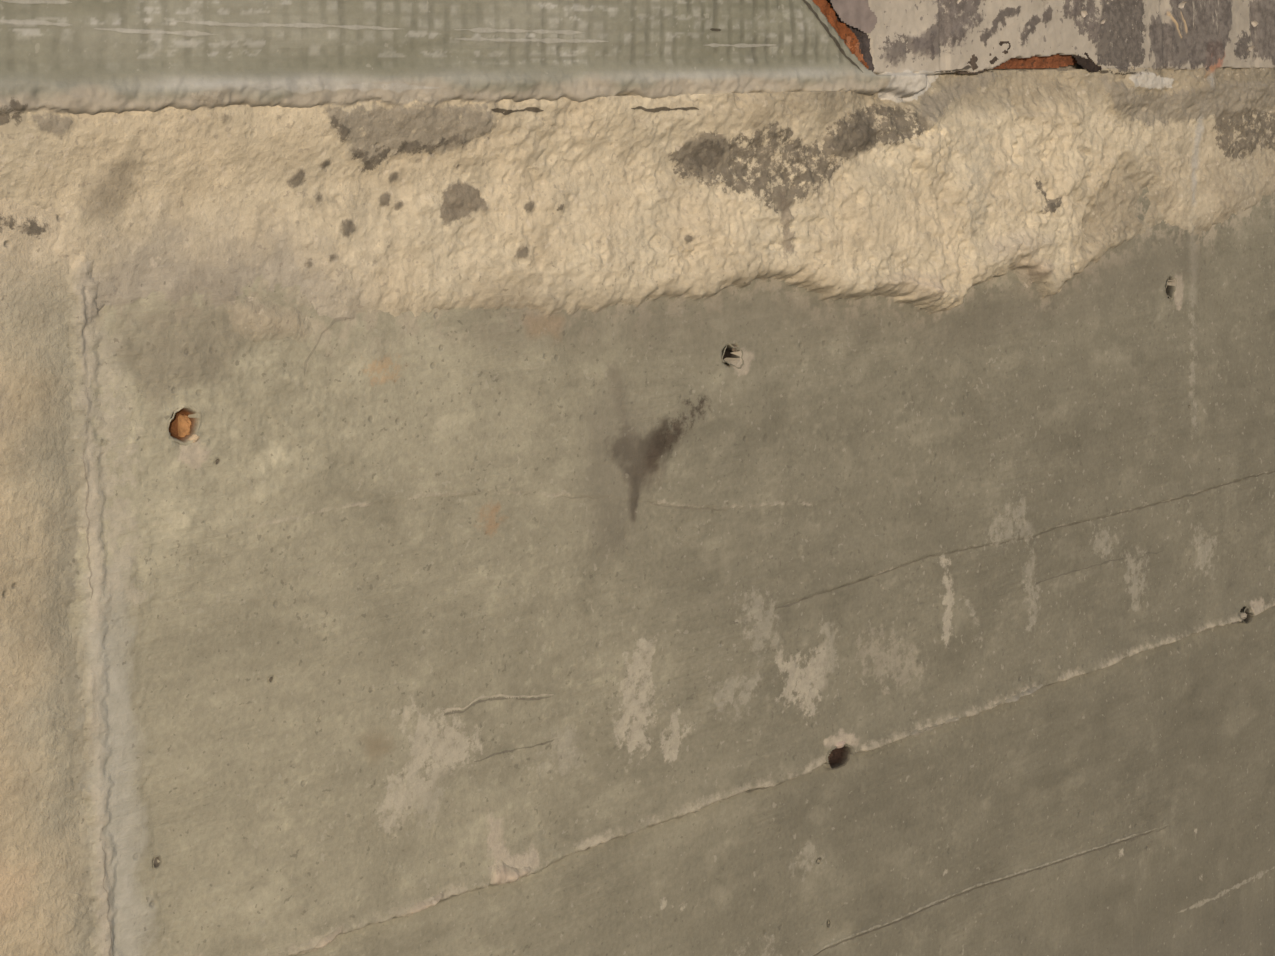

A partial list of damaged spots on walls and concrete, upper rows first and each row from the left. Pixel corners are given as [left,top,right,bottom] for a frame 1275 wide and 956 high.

spalling [0,0,1275,322]
leakage [452,60,1275,578]
leakage [980,485,1046,644]
crack [775,467,1275,610]
leakage [1084,508,1155,616]
leakage [1184,519,1224,593]
leakage [368,689,490,855]
crack [430,693,554,717]
crack [474,739,554,762]
leakage [527,716,590,791]
leakage [606,536,985,785]
leakage [782,828,829,890]